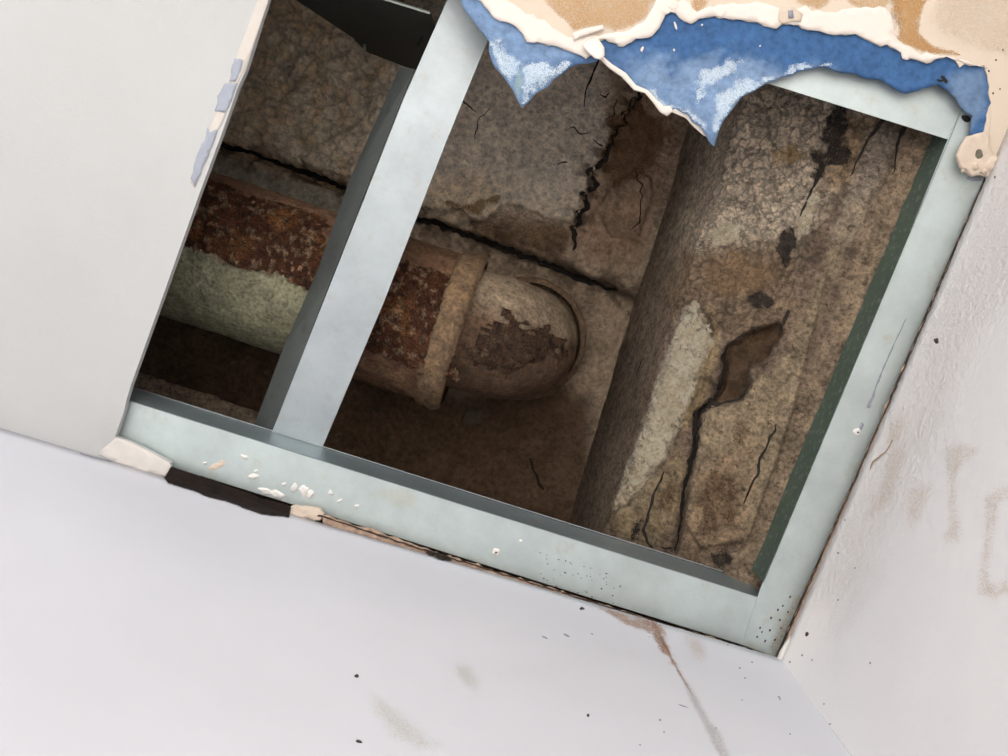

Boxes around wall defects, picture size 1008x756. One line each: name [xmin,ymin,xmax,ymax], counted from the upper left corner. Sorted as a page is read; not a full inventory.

peeling [573,25,605,60]
peeling [215,58,243,113]
peeling [191,128,218,185]
crack [221,141,346,189]
crack [415,59,643,291]
crack [799,164,824,218]
crack [850,119,907,176]
peeling [247,470,314,500]
crack [641,332,748,552]
crack [743,424,776,504]